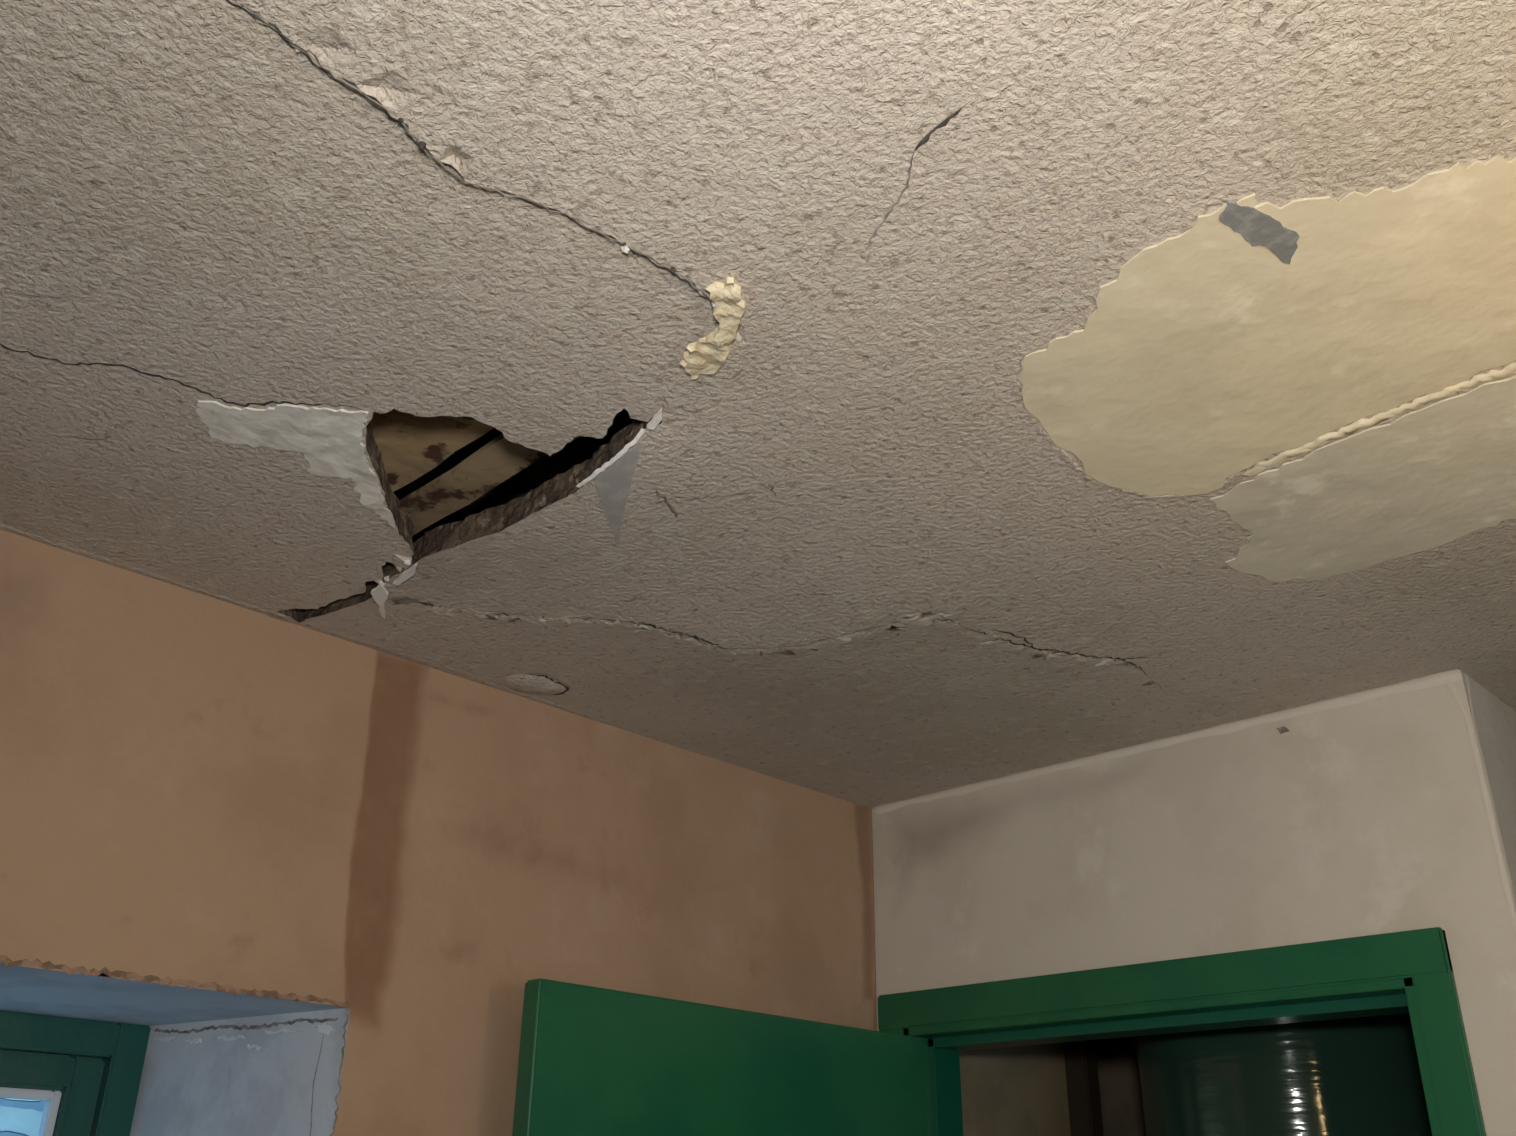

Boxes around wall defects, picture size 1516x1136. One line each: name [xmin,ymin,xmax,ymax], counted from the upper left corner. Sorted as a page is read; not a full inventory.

peeling [1254,3,1302,37]
crack [227,0,718,308]
crack [868,100,971,247]
crack [6,291,95,299]
crack [0,343,365,411]
peeling [680,277,745,380]
peeling [1010,155,1516,582]
flaking render [594,408,663,544]
peeling [371,562,419,619]